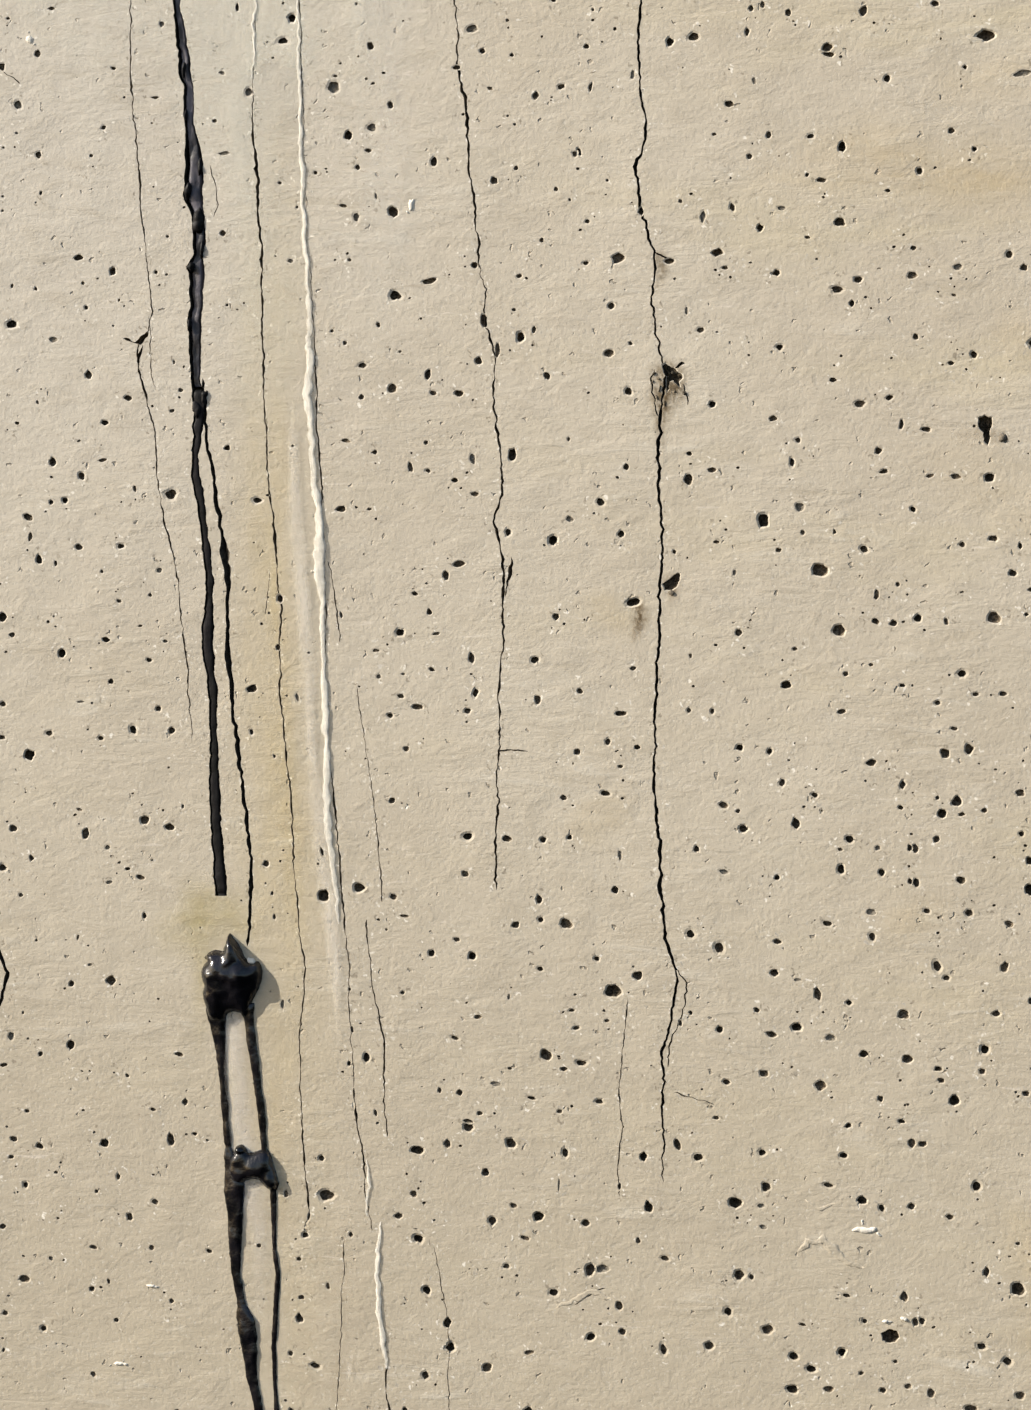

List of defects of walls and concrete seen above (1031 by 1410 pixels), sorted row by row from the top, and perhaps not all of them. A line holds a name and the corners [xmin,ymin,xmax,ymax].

crack [0,950,10,1006]
crack [123,0,254,946]
crack [251,23,310,1212]
efflorescence [296,0,340,924]
crack [299,1,341,669]
crack [328,689,388,1409]
leakage [365,1160,388,1368]
crack [453,0,528,890]
crack [617,1002,628,1196]
crack [633,0,714,1182]